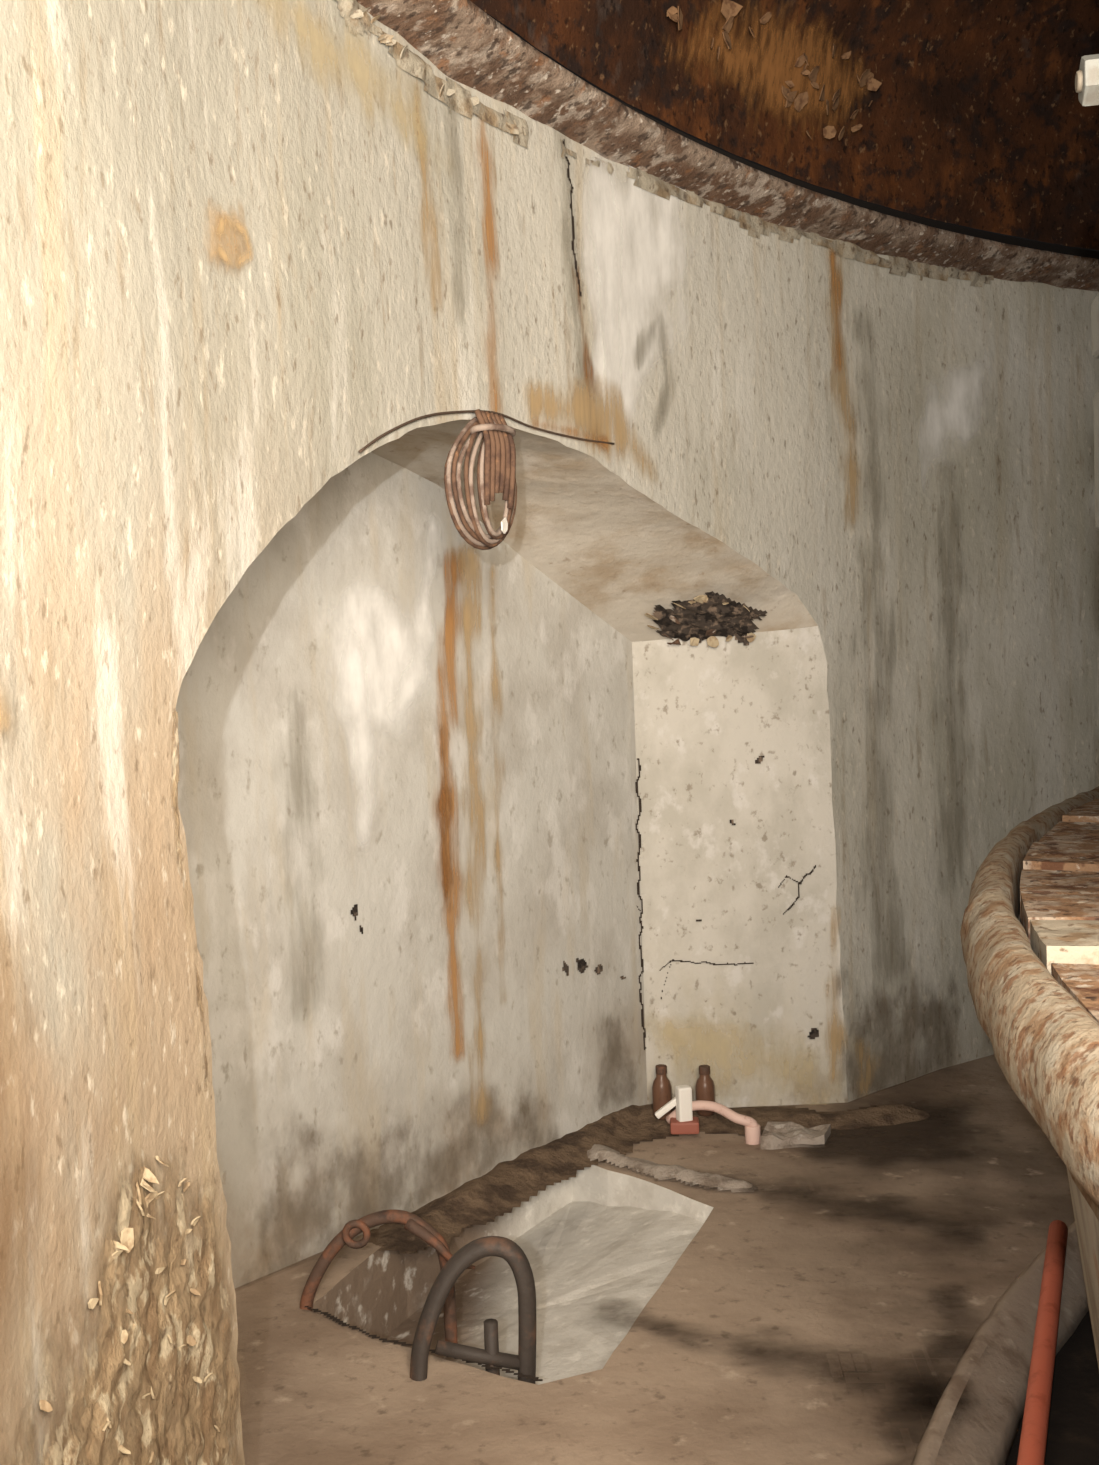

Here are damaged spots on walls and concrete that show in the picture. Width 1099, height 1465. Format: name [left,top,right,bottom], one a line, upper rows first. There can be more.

spalling [336,0,529,148]
corrosion [481,138,495,263]
corrosion [830,251,857,517]
corrosion [438,546,500,1061]
spalling [16,1156,239,1465]